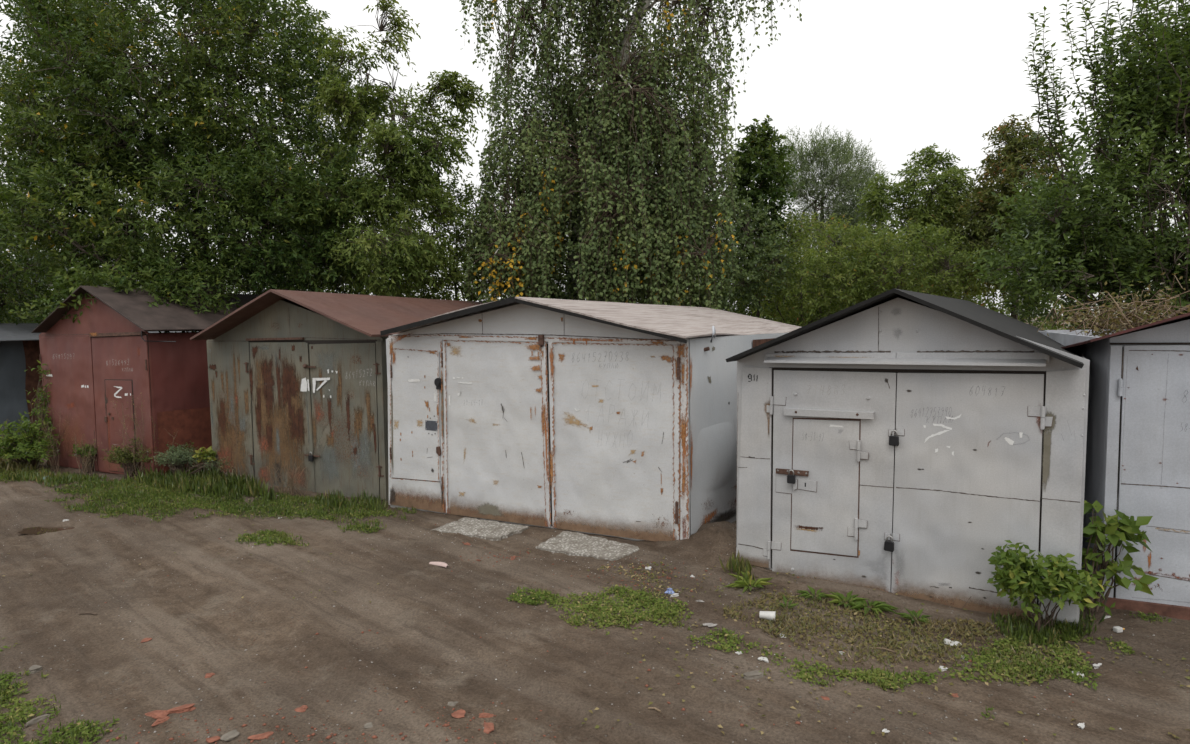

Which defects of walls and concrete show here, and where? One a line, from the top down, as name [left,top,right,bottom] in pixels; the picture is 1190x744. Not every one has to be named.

rust [209,333,693,540]